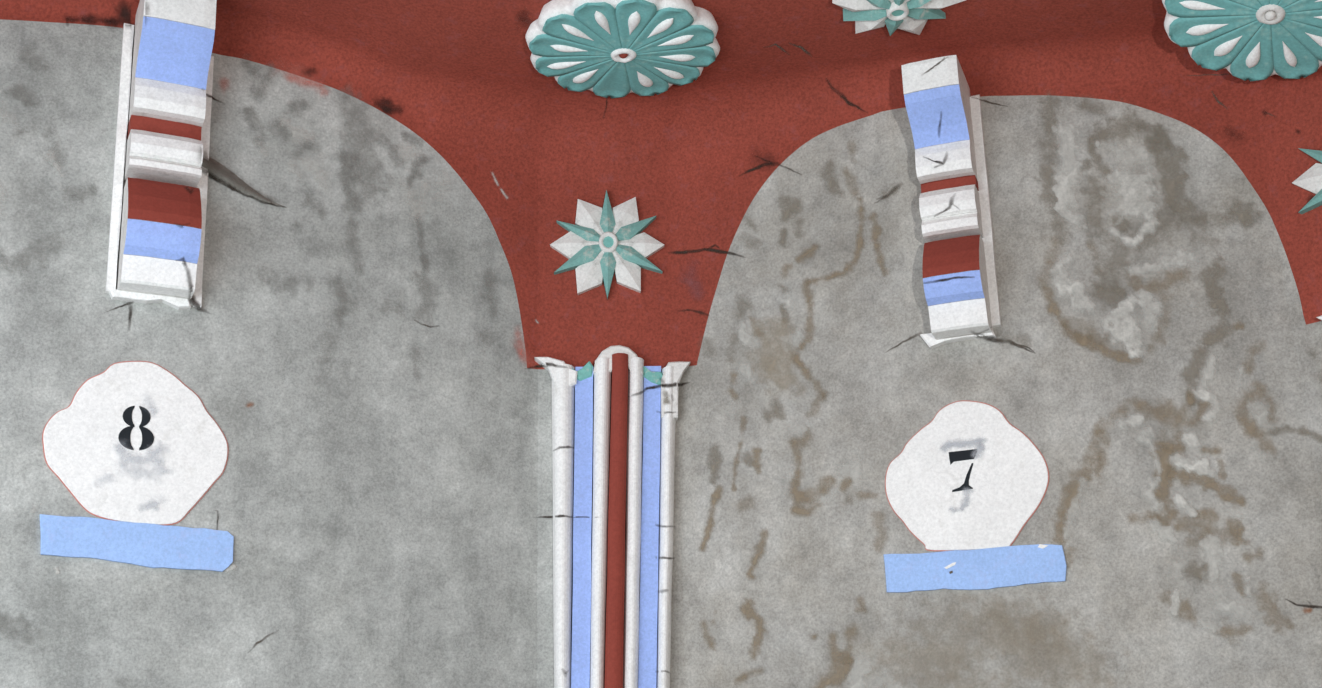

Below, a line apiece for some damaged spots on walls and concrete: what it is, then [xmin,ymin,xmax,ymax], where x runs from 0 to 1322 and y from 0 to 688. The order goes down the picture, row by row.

crack [831,86,862,110]
damp [1043,112,1204,246]
crack [673,245,737,255]
crack [181,258,201,310]
damp [780,199,883,378]
damp [1046,255,1162,362]
crack [976,334,1031,351]
crack [639,383,686,413]
damp [1119,263,1250,634]
damp [701,443,761,550]
damp [741,602,764,657]
crack [1290,601,1322,612]